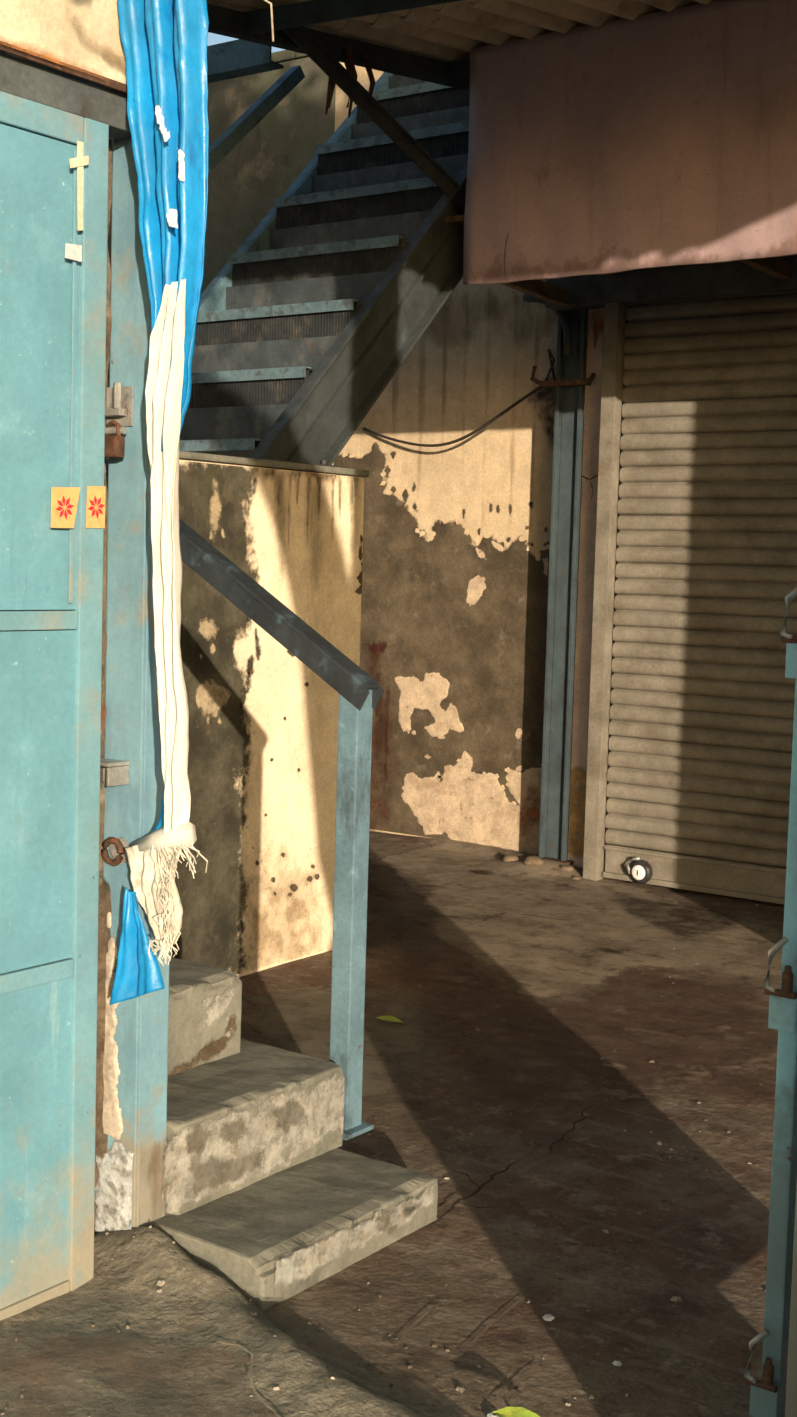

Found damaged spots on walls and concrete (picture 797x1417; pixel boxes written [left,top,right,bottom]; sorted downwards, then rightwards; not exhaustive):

damp [170,561,261,975]
damp [179,461,259,582]
spalling [334,443,550,854]
crack [428,1105,596,1226]